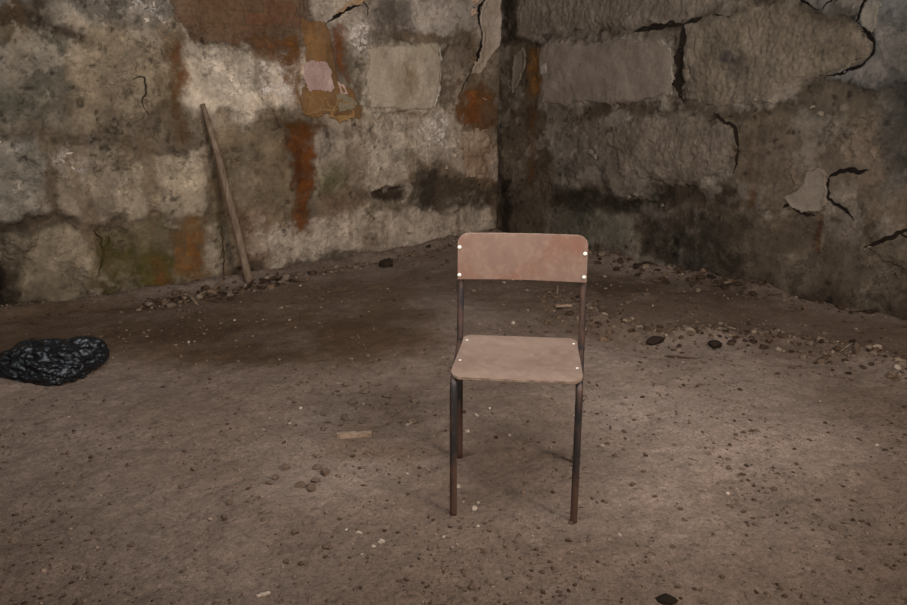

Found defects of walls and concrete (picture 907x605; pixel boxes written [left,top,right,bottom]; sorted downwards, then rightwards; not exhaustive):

peeling [300,17,362,123]
crack [326,1,369,24]
crack [459,0,485,96]
rust [456,84,494,138]
flaking render [471,0,882,107]
rust [286,120,321,231]
peeling [783,168,828,217]
crack [864,228,907,247]